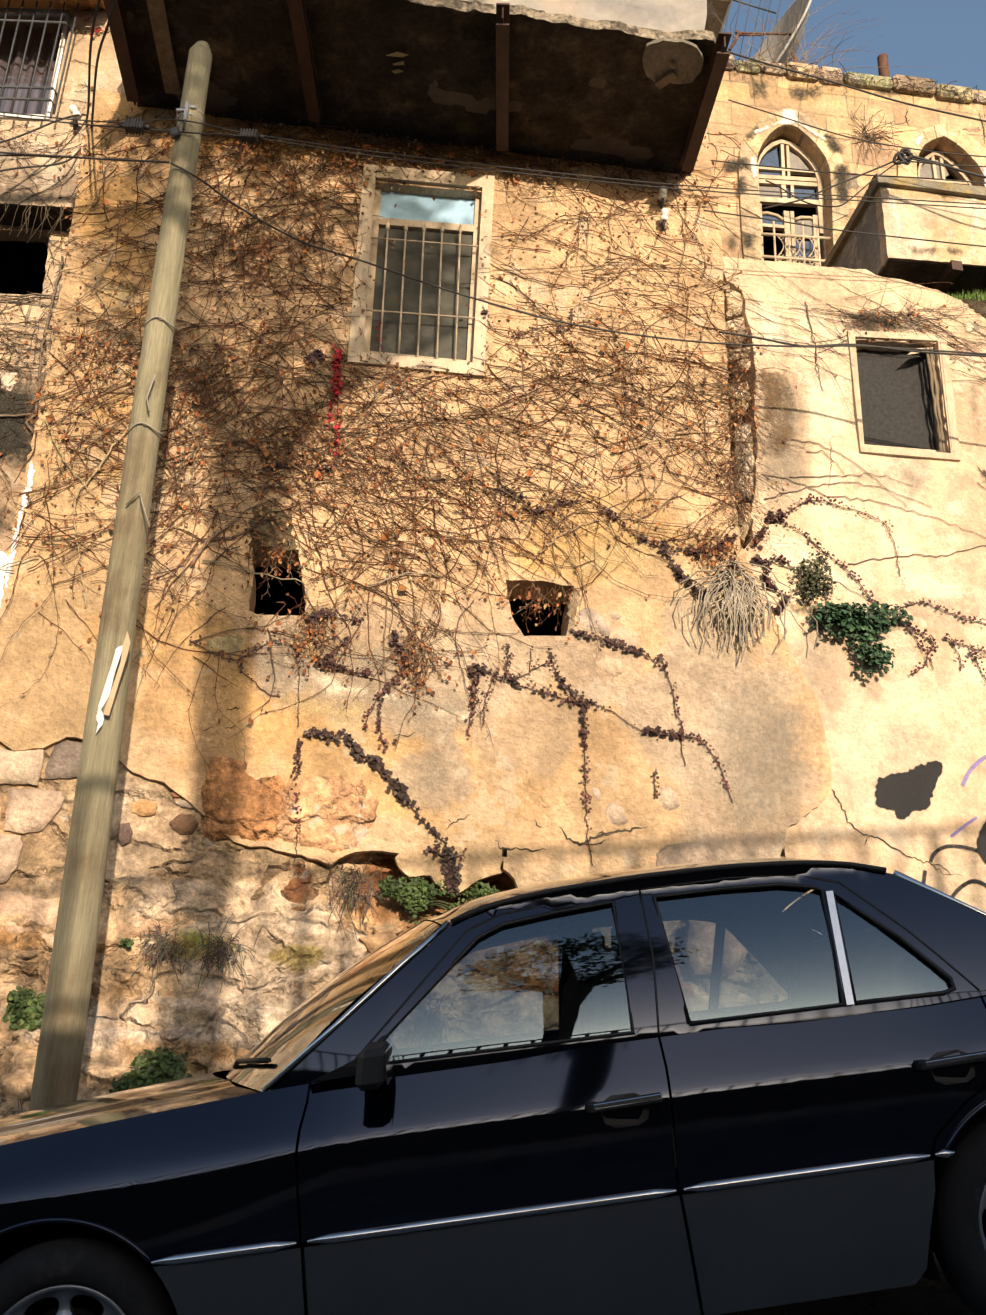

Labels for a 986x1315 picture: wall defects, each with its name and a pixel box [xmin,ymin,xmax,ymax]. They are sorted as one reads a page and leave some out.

peeling [0,372,18,391]
peeling [0,551,8,606]